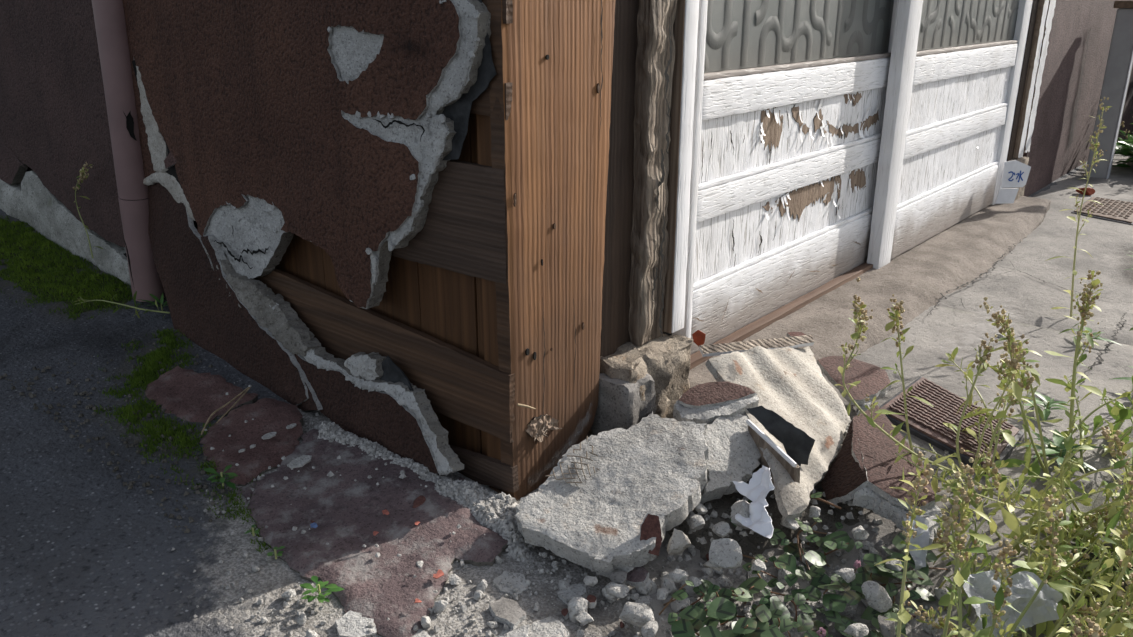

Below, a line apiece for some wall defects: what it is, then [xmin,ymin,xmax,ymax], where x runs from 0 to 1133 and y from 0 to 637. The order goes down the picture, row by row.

flaking render [327,26,378,84]
flaking render [344,0,480,285]
peeling [762,163,869,222]
peeling [760,92,879,153]
flaking render [201,196,464,476]
crack [927,239,1133,387]